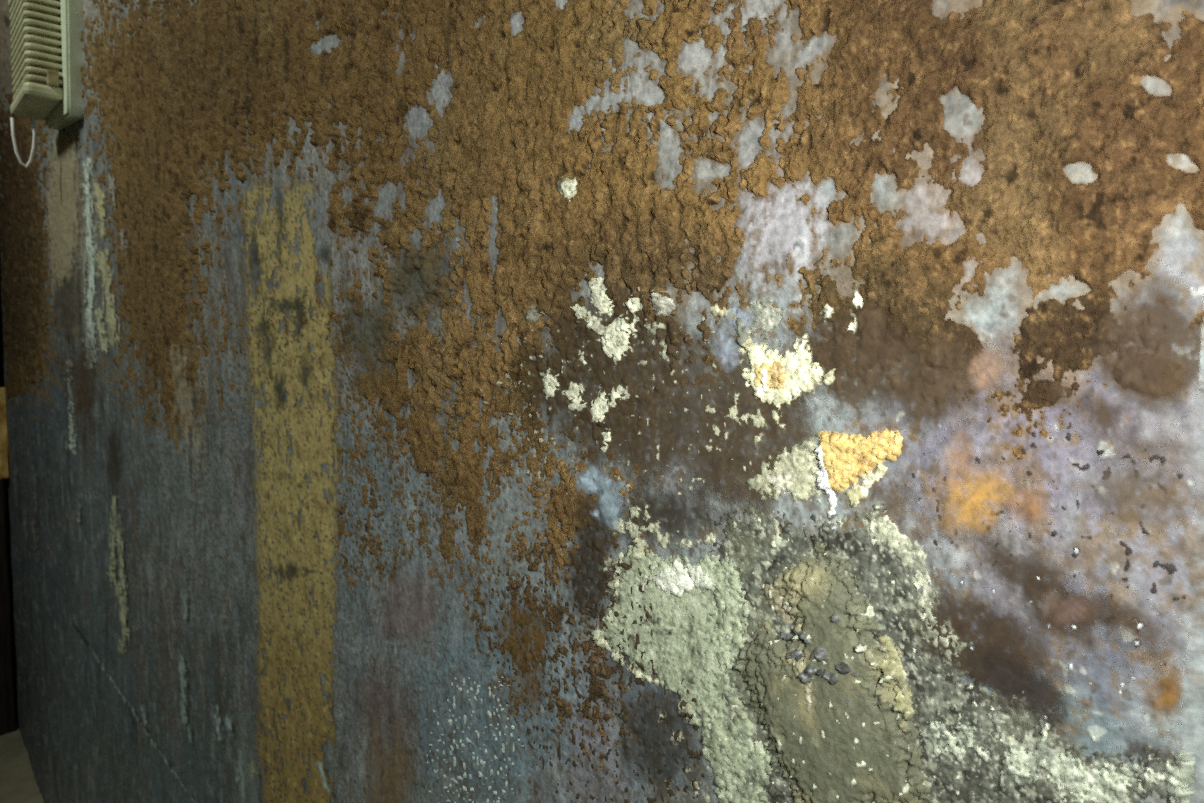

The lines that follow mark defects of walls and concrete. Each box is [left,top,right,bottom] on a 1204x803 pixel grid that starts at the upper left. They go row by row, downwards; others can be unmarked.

corrosion [0,86,67,420]
corrosion [694,308,726,388]
corrosion [788,315,808,349]
corrosion [1189,312,1204,329]
corrosion [604,449,645,517]
corrosion [952,479,997,523]
corrosion [1005,446,1025,459]
damp [480,287,816,803]
corrosion [562,662,581,694]
damp [844,503,1195,803]
damp [829,701,880,787]